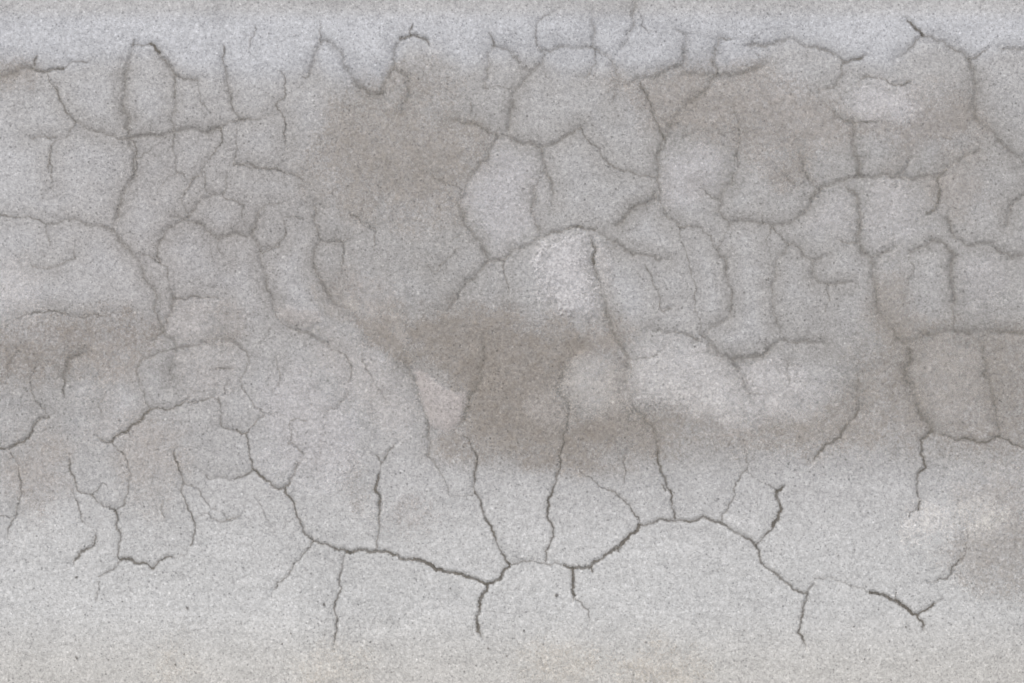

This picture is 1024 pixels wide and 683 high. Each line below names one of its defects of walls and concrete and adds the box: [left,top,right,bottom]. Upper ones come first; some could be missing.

crack [34,56,64,100]
damp [302,63,537,248]
crack [557,225,596,265]
damp [317,272,1024,477]
crack [0,416,50,450]
crack [99,402,184,443]
crack [814,410,858,460]
crack [917,430,1012,510]
crack [74,501,195,569]
crack [236,410,511,641]
crack [545,440,808,640]
crack [869,591,935,627]